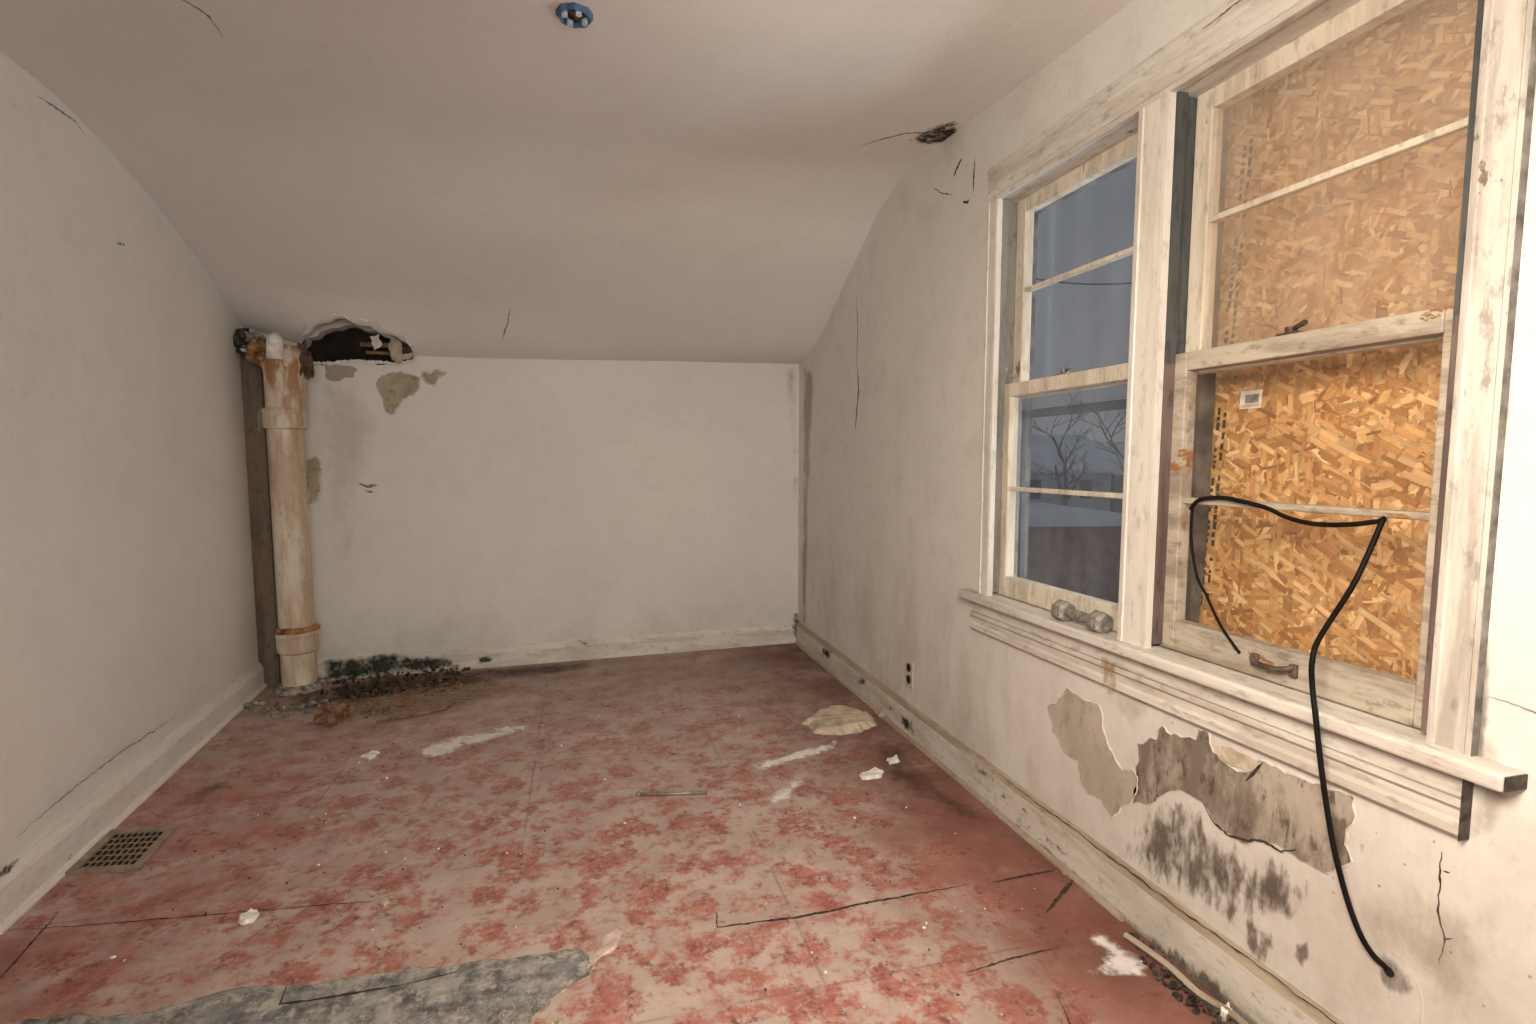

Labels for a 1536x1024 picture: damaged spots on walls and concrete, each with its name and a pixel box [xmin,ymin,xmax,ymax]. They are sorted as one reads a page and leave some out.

crack [183,0,225,39]
flaking render [297,312,447,415]
rust [274,623,320,635]
crack [1487,696,1536,714]
peeling [1047,687,1357,876]
damp [1146,808,1289,958]
damp [1297,945,1307,963]